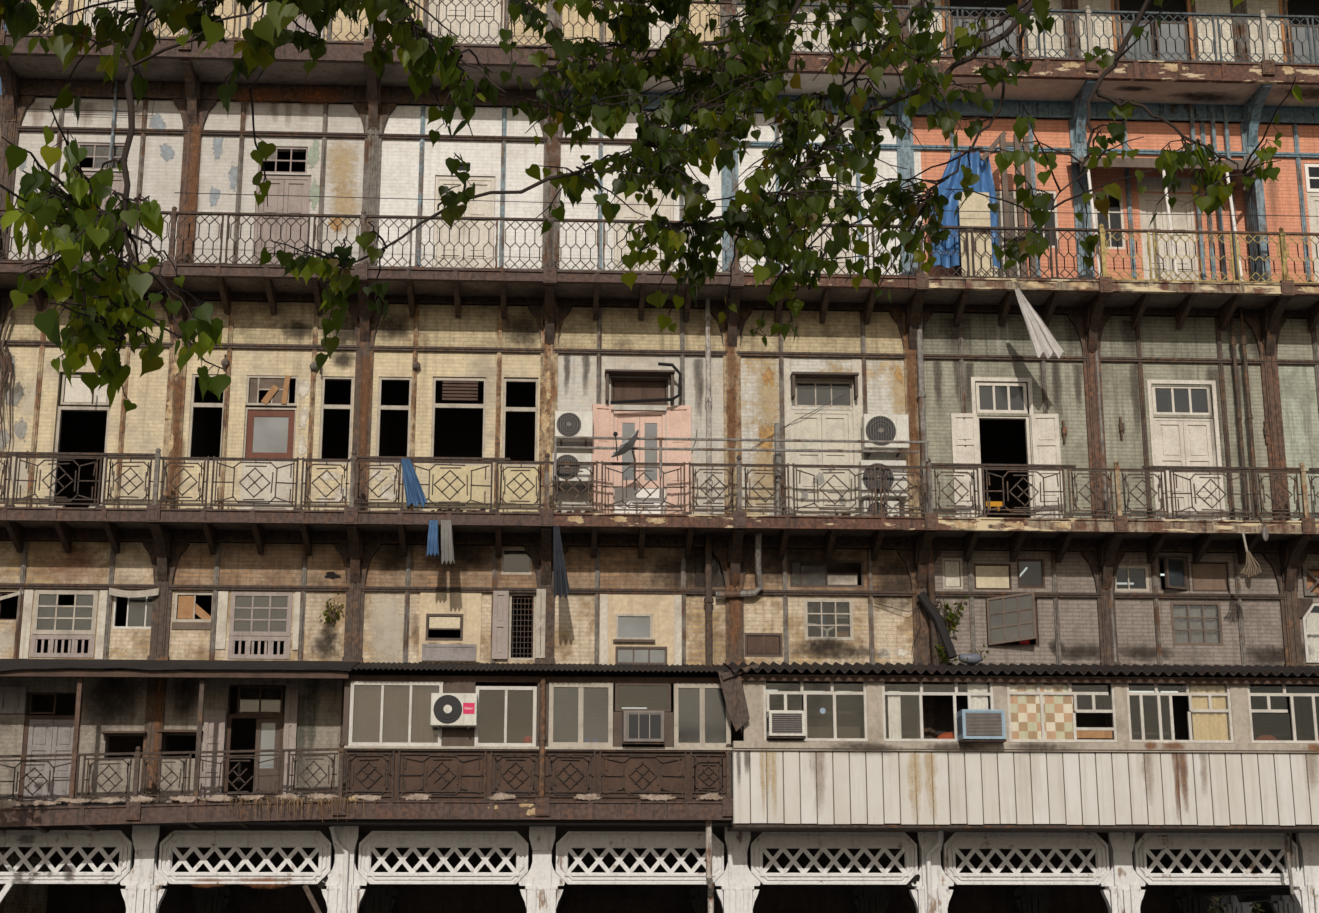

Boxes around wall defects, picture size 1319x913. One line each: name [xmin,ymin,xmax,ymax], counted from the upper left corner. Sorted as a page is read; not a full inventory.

peeling [1160,63,1188,72]
water stain [1181,93,1225,101]
peeling [954,520,975,529]
rust [1146,743,1187,804]
peeling [0,792,382,808]
peeling [401,793,431,801]
peeling [488,792,535,816]
peeling [573,793,601,801]